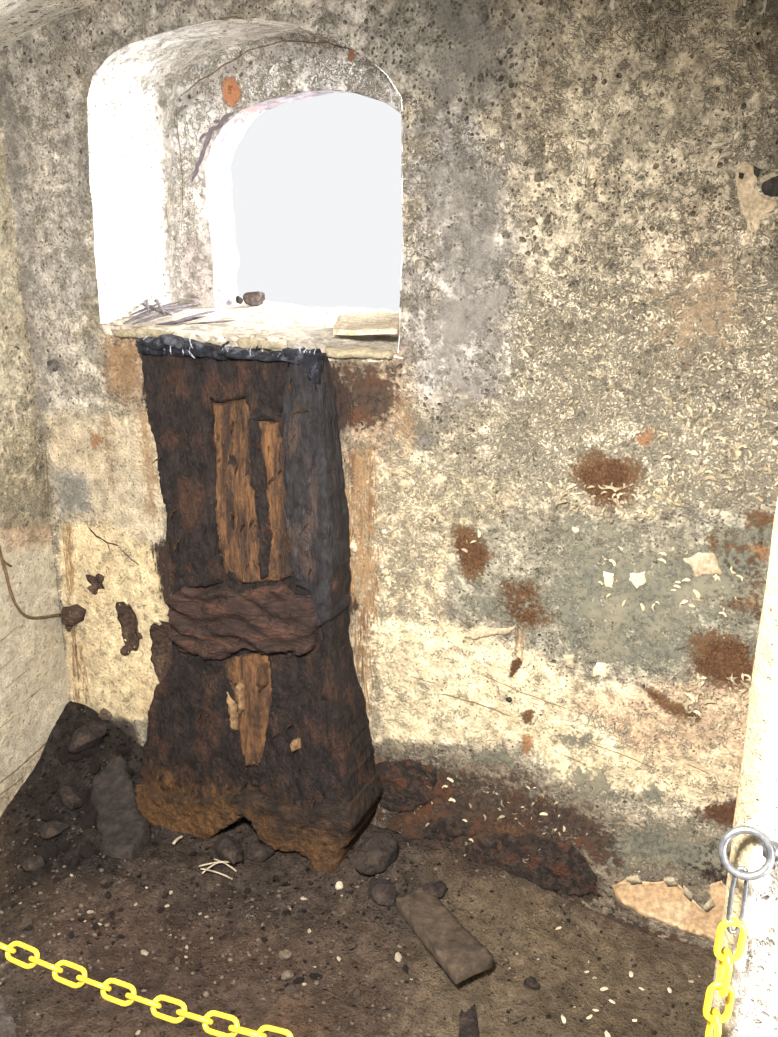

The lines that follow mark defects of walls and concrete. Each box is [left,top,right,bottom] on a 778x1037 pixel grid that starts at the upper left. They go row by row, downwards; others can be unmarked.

corrosion [221,77,241,106]
spalling [736,161,778,245]
corrosion [568,448,645,509]
corrosion [451,524,494,582]
corrosion [488,579,553,677]
corrosion [685,629,755,690]
corrosion [695,792,738,829]
damp [370,756,730,951]
spalling [612,875,726,941]